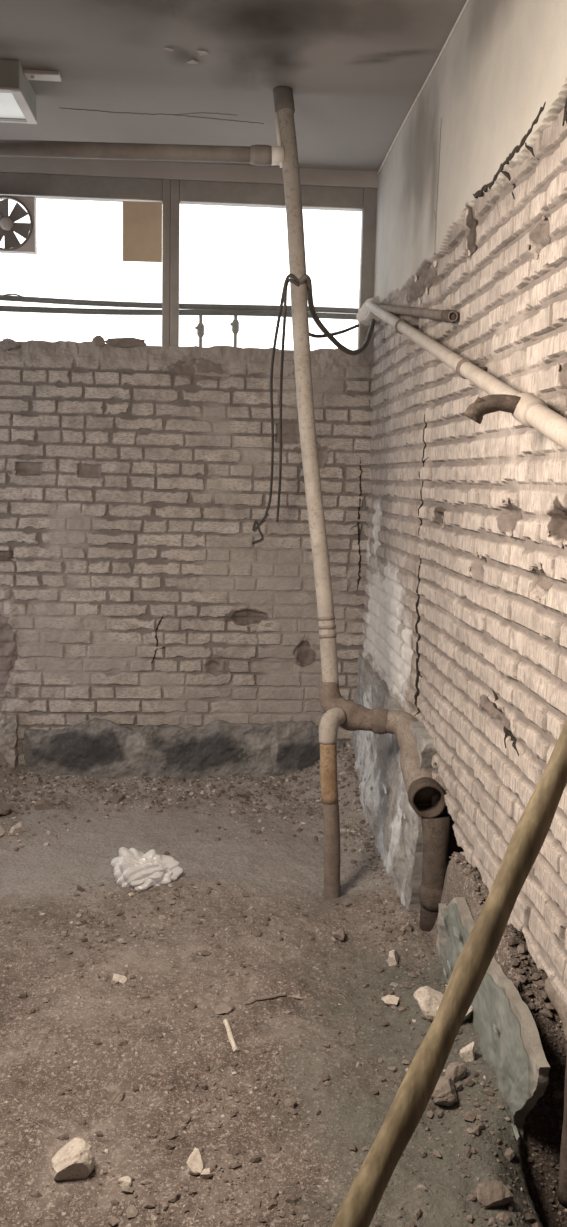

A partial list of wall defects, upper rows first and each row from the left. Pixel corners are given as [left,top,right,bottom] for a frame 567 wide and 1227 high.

spalling [465,204,476,257]
spalling [526,215,550,260]
spalling [407,260,437,306]
spalling [556,363,567,404]
spalling [432,507,446,528]
spalling [496,497,522,537]
spalling [546,497,567,548]
crack [414,416,429,716]
spalling [531,562,554,602]
crack [152,616,165,662]
spalling [218,607,275,627]
spalling [478,693,510,732]